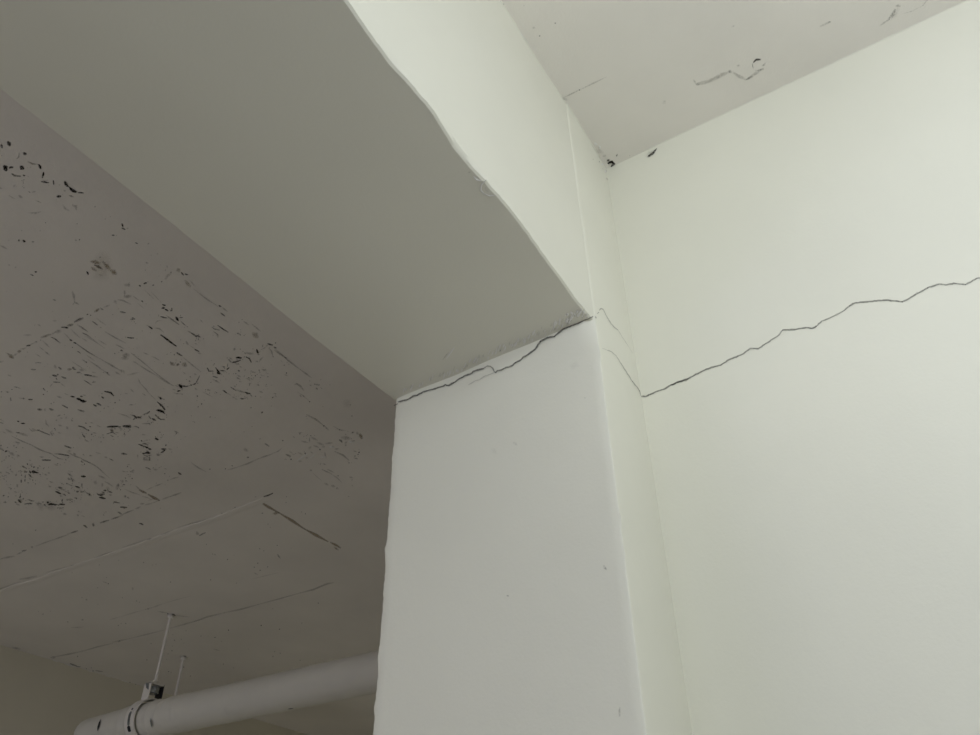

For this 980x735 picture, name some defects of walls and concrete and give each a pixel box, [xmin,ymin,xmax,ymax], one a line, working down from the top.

crack [396,316,593,405]
crack [632,278,978,397]